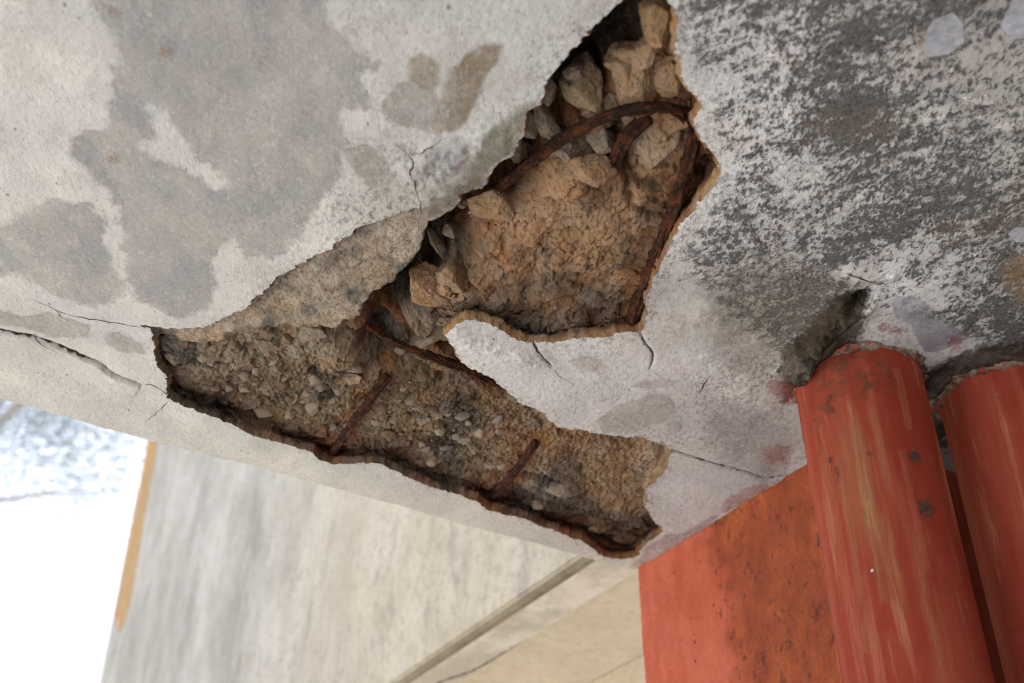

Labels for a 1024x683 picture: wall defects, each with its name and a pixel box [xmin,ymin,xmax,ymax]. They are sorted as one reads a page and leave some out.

leakage [383,46,500,132]
leakage [0,0,389,318]
crack [398,137,448,210]
spalling [141,0,1024,559]
crack [0,299,140,368]
leakage [772,289,869,403]
crack [677,450,782,478]